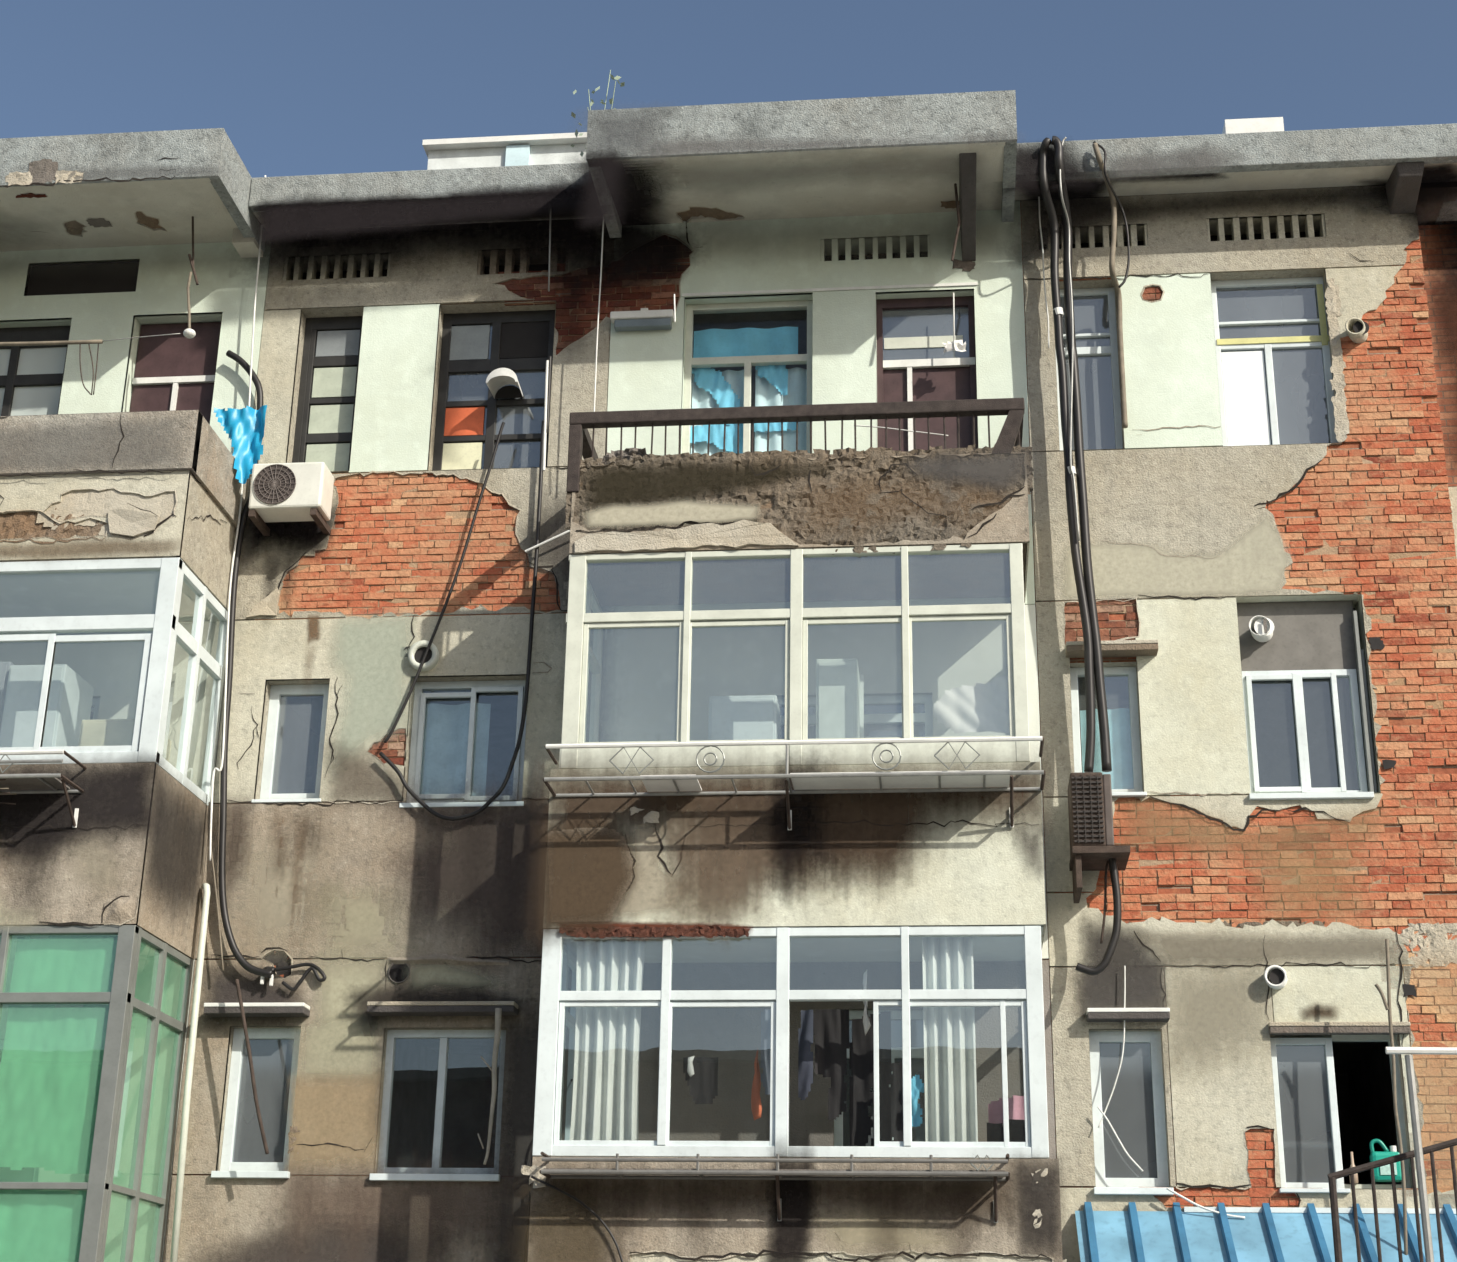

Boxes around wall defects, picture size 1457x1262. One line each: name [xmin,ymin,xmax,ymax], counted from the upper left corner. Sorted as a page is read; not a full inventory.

flaking render [493,206,745,355]
crack [0,536,105,544]
crack [0,416,227,536]
flaking render [564,443,1034,556]
flaking render [246,471,567,766]
crack [230,677,401,806]
flaking render [1035,232,1457,1209]
damp [260,866,306,928]
damp [332,898,394,945]
damp [409,799,632,954]
damp [669,830,768,913]
crack [623,819,1039,895]